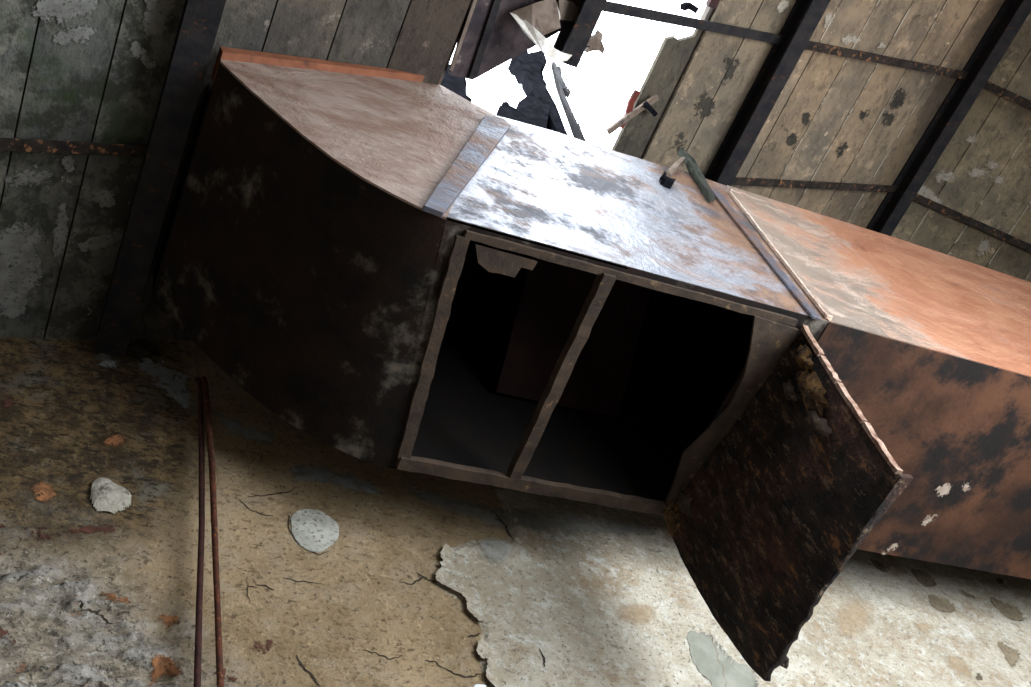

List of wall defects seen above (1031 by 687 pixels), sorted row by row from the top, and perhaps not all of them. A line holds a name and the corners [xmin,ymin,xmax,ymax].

leakage [721,55,740,86]
leakage [694,91,715,119]
mould [881,88,907,126]
mould [786,110,811,150]
rust [782,344,833,443]
crack [405,572,437,585]
crack [364,649,481,678]
flaking render [687,631,758,687]